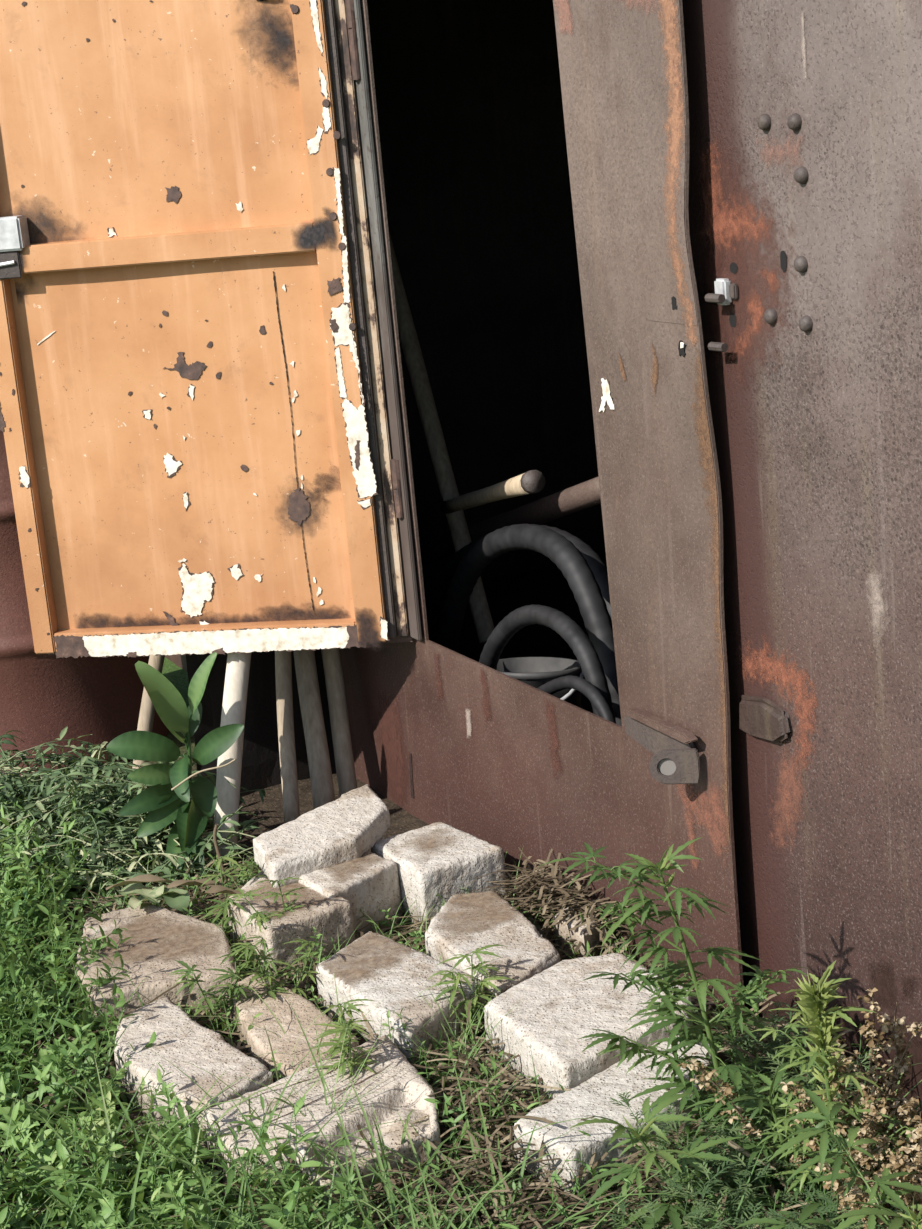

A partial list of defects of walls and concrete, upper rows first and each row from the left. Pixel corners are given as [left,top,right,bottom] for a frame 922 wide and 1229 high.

peeling [306,0,332,155]
peeling [327,167,378,510]
rust [702,154,783,378]
peeling [18,466,31,488]
peeling [47,558,366,658]
rust [77,606,380,647]
peeling [380,616,390,641]
rust [745,646,816,845]